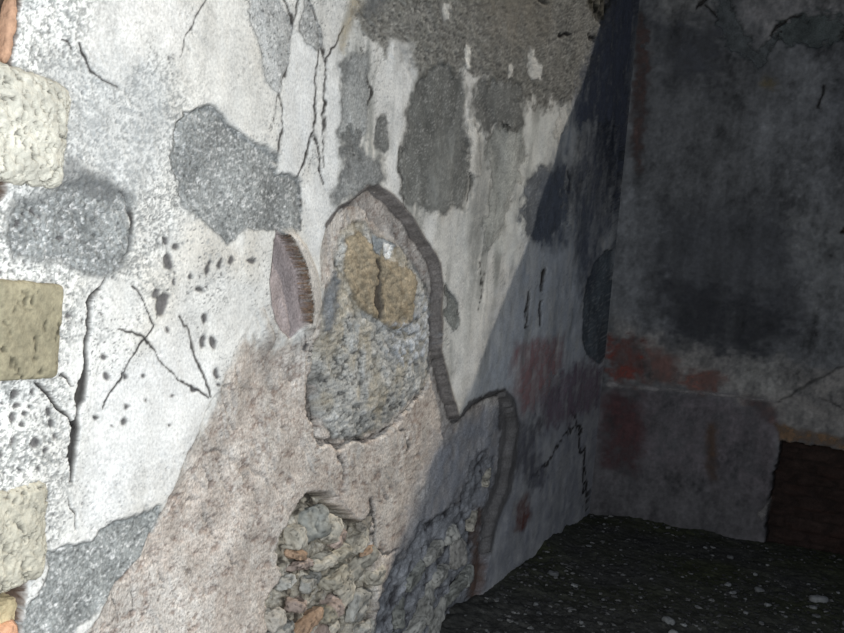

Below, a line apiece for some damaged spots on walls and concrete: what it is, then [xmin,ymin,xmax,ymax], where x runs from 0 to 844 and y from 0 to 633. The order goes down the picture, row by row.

crack [283,0,316,41]
flaking render [775,8,844,48]
crack [273,67,287,163]
crack [298,26,344,231]
crack [34,286,100,481]
crack [102,286,211,409]
peeling [1,45,565,633]
flaking render [582,249,614,364]
crack [532,412,589,511]